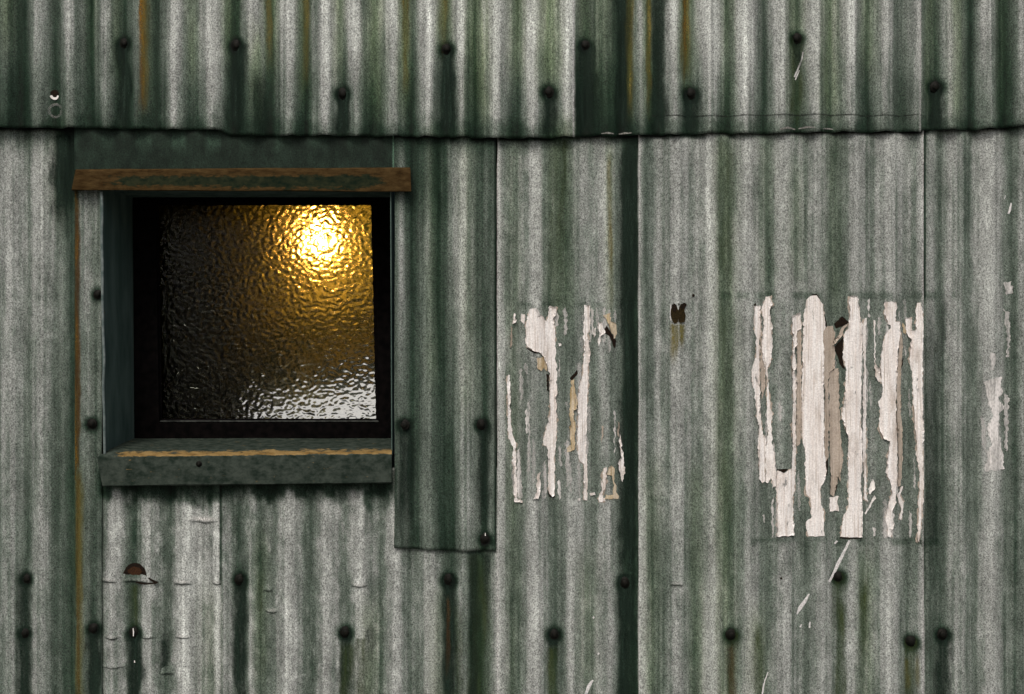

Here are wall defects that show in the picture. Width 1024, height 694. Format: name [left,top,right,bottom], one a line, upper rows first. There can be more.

rust [139,0,147,97]
rust [670,302,686,353]